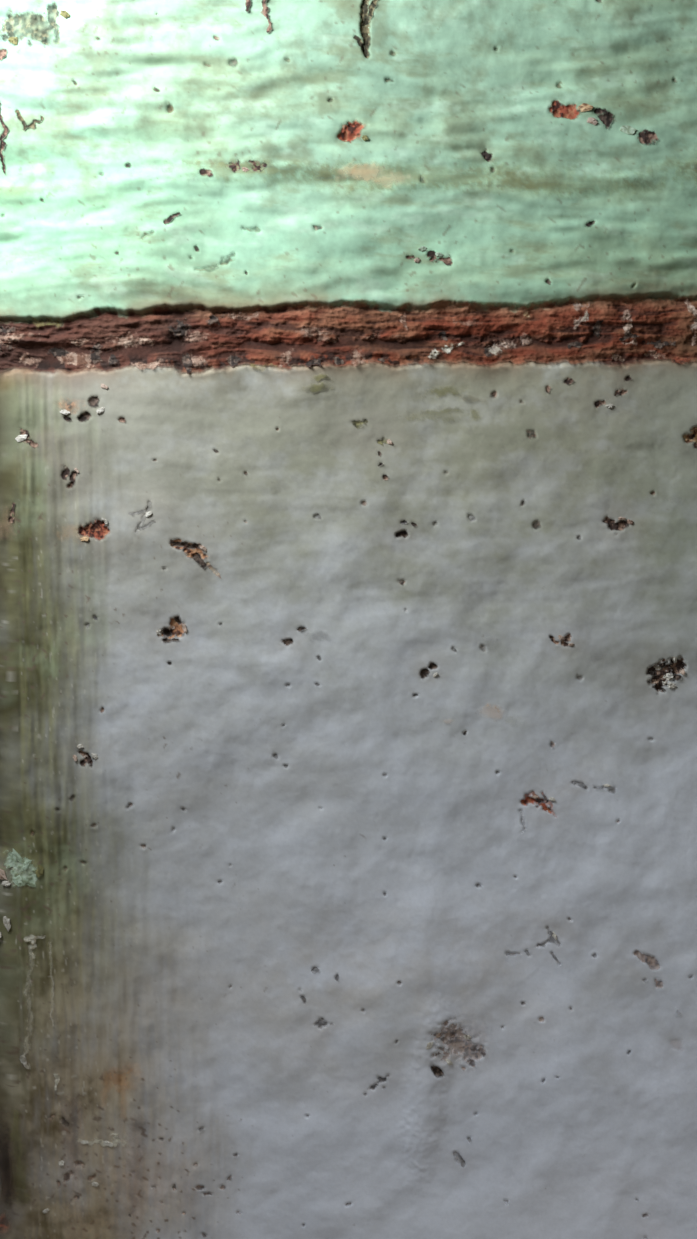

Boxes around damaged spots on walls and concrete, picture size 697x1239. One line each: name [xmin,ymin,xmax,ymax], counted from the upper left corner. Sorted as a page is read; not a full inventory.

spalling [683,427,697,449]
damp [0,1118,26,1231]